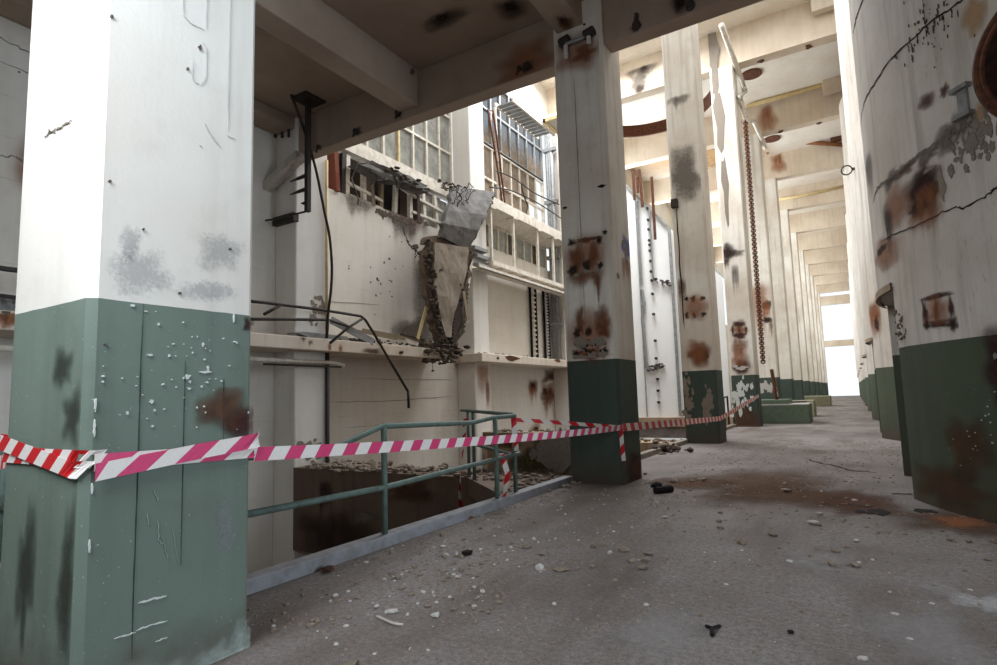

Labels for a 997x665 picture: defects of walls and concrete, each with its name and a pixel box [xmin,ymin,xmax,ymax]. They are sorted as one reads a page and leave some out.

crack [0,37,30,74]
crack [861,0,963,116]
peeling [923,107,997,202]
rust [884,169,938,229]
crack [880,186,997,243]
spalling [458,192,496,337]
rust [568,230,608,296]
rust [572,309,609,360]
rust [922,292,958,331]
rust [201,391,254,436]
peeling [682,371,714,426]
peeling [731,365,773,417]